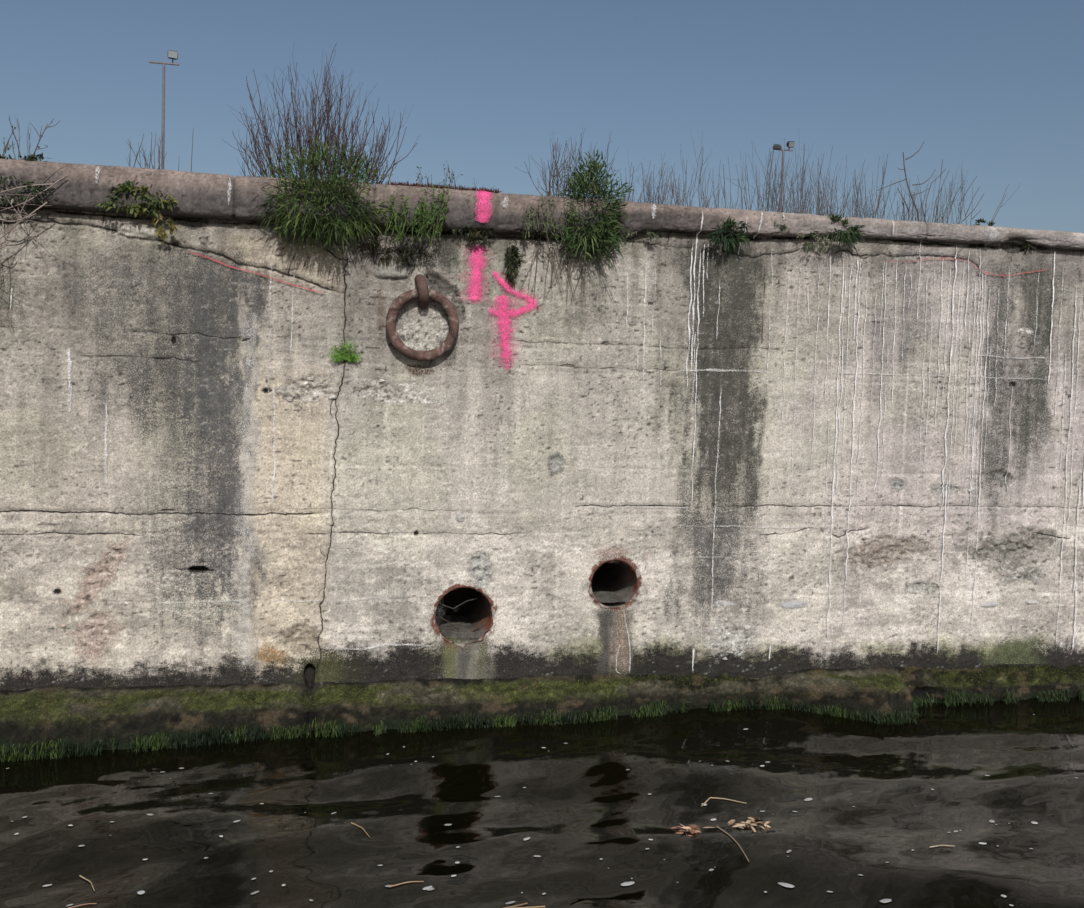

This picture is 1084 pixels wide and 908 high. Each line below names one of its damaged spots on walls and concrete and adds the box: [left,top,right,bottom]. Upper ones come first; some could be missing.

crack [390,230,578,241]
crack [509,236,1008,370]
crack [0,206,519,680]
water stain [0,212,1084,691]
corrosion [592,547,642,610]